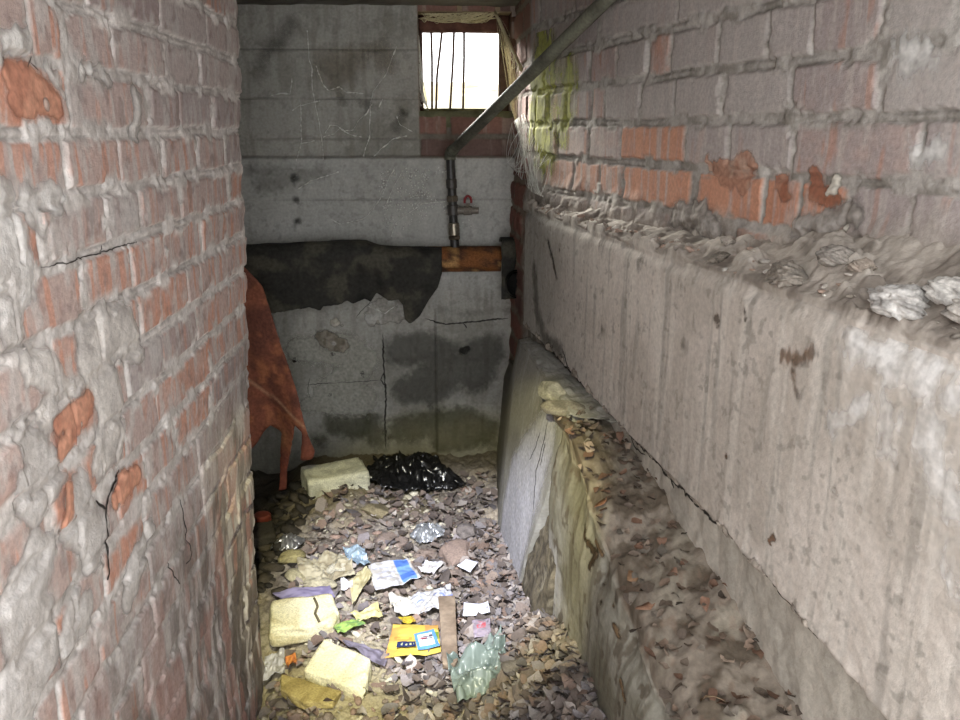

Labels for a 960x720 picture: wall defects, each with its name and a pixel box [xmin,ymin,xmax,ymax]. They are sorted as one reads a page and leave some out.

spalling [1,58,64,120]
water stain [553,56,578,149]
spalling [705,151,758,196]
spalling [808,165,841,208]
crack [41,241,137,268]
spalling [365,297,405,327]
flaking render [0,176,145,720]
crack [308,336,387,447]
water stain [286,333,502,452]
crack [542,343,717,524]
crack [96,470,119,580]
flaking render [121,519,155,614]